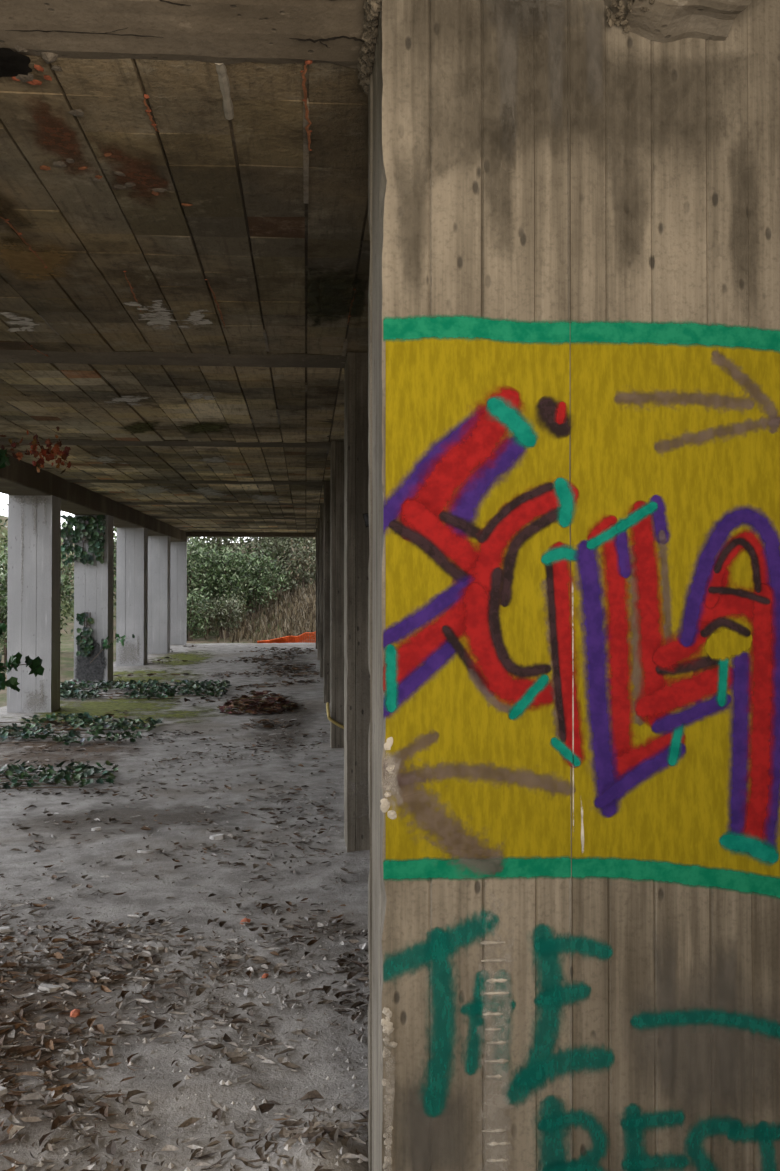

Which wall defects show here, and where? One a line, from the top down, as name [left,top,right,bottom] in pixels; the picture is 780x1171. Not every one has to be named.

crack [5,28,163,38]
spalling [0,45,62,85]
leakage [306,271,367,325]